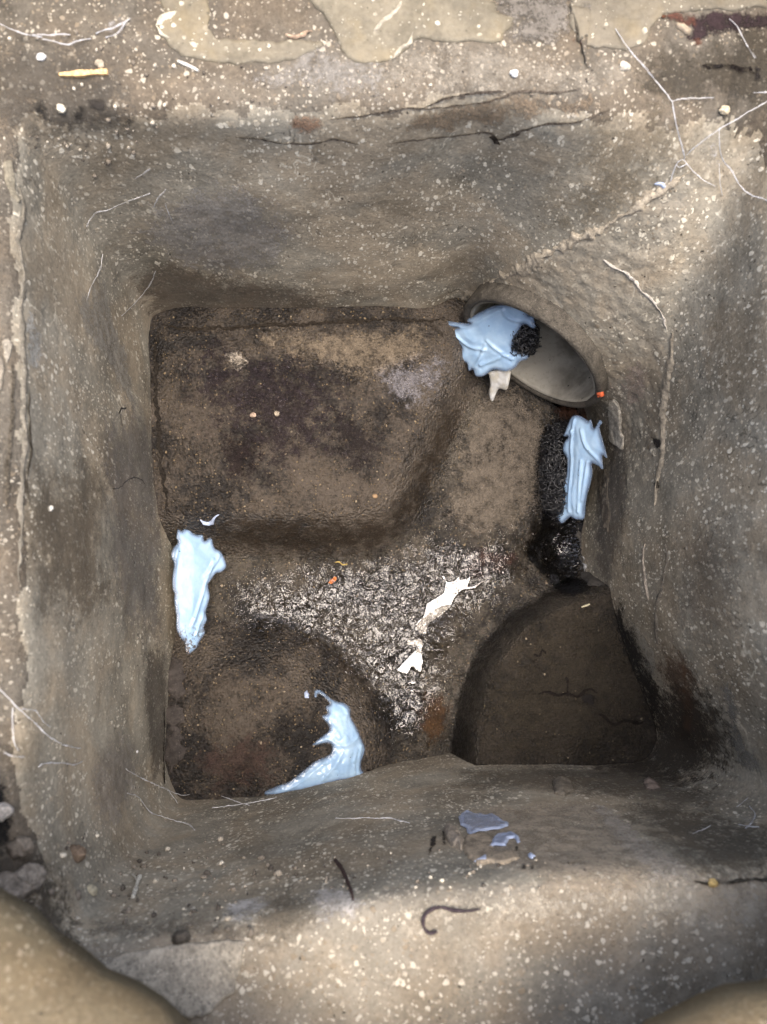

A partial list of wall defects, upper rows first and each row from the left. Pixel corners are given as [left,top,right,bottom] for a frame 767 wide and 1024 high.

crack [240,87,609,145]
water stain [184,344,387,479]
water stain [210,385,590,762]